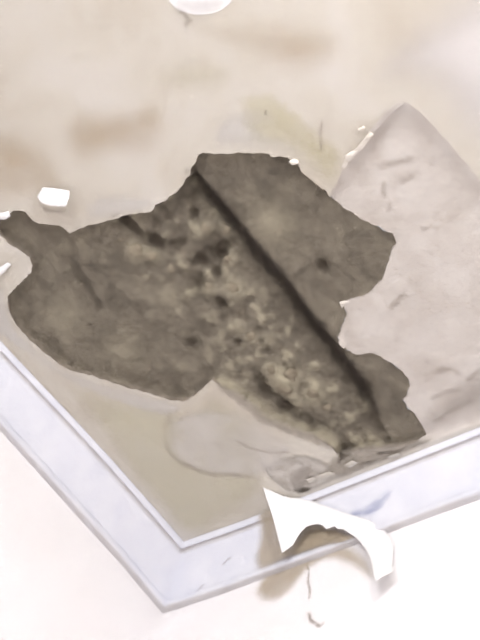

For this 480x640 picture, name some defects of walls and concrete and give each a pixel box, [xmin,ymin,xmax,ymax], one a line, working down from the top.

spalling [0,100,480,458]
peeling [263,487,394,581]